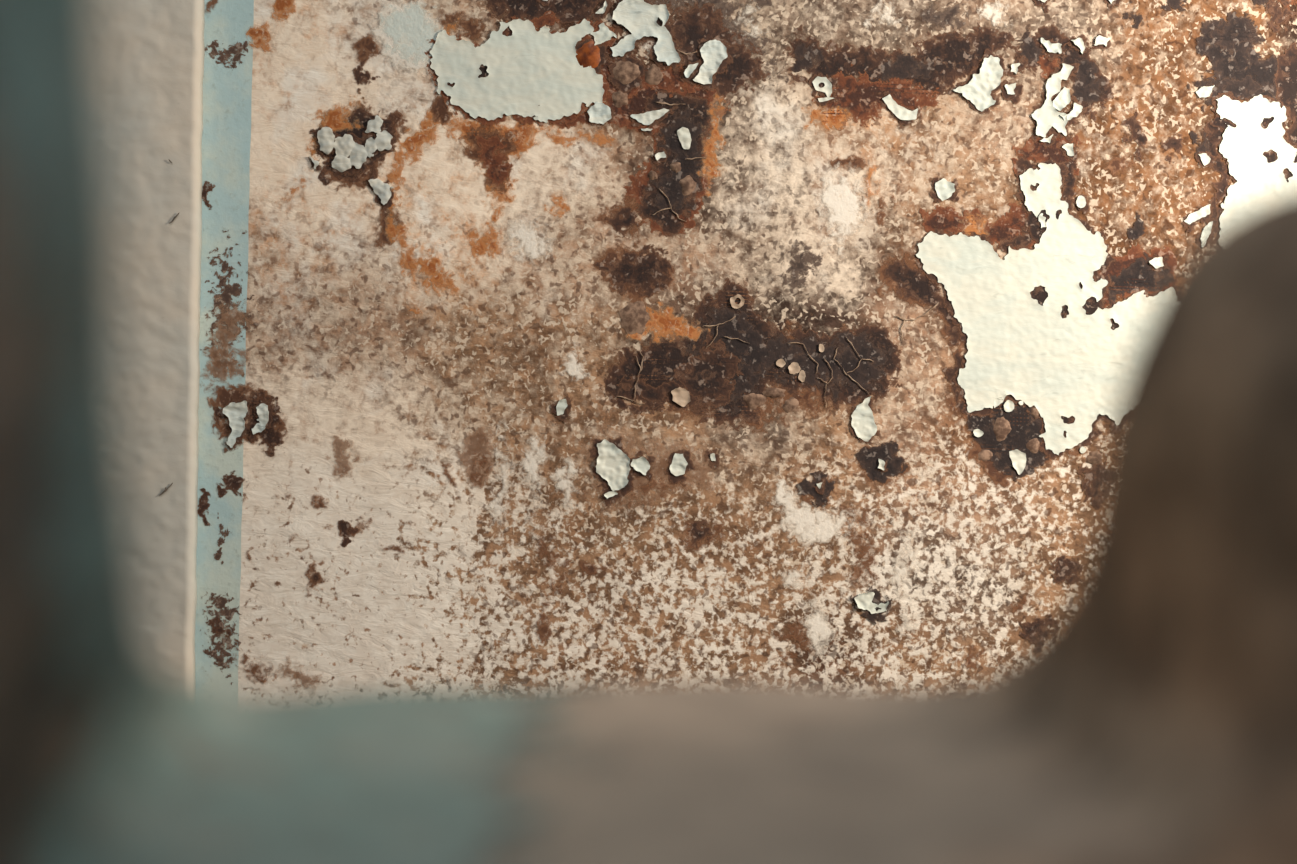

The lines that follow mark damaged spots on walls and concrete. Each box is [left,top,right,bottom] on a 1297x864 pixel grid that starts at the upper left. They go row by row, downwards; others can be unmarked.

peeling [425,0,733,166]
corrosion [290,0,1114,433]
leakage [739,0,772,37]
leakage [864,0,902,26]
peeling [915,33,1164,475]
peeling [1182,84,1297,244]
corrosion [197,471,245,564]
corrosion [200,230,288,457]
peeling [0,0,589,864]
peeling [590,436,720,508]
corrosion [877,248,1052,489]
corrosion [200,591,319,688]